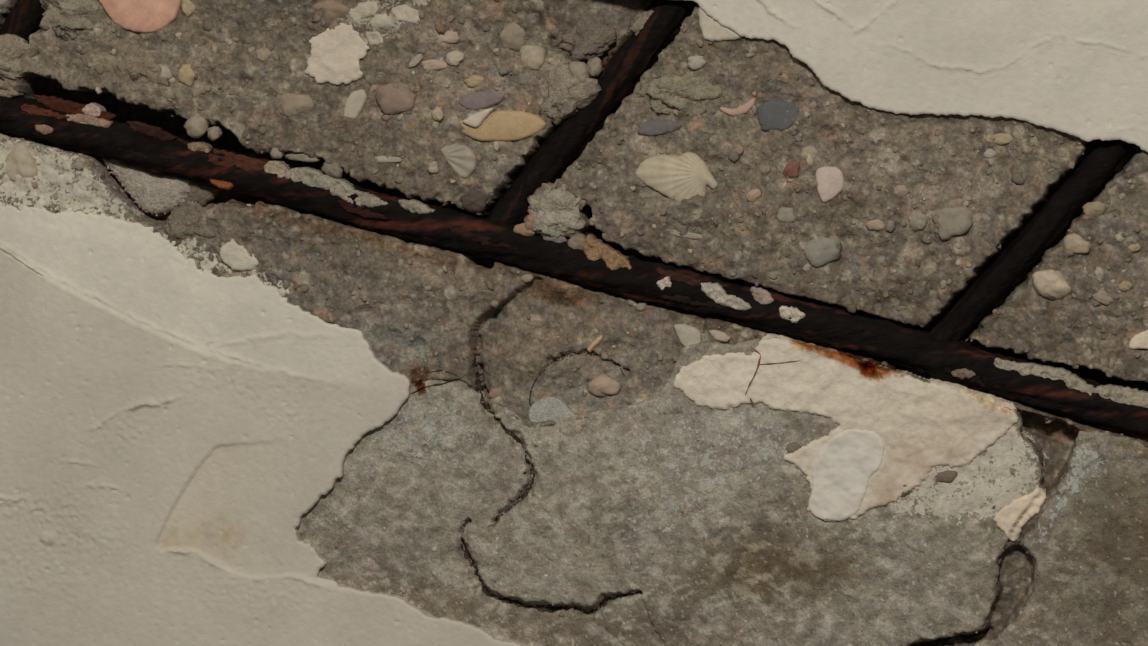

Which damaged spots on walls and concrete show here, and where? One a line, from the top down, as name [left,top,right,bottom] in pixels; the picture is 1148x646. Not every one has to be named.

corrosion [210,179,234,190]
spalling [0,0,656,219]
spalling [550,2,1101,331]
crack [411,338,639,615]
spalling [0,133,1148,646]
corrosion [799,343,907,378]
crack [910,630,989,646]